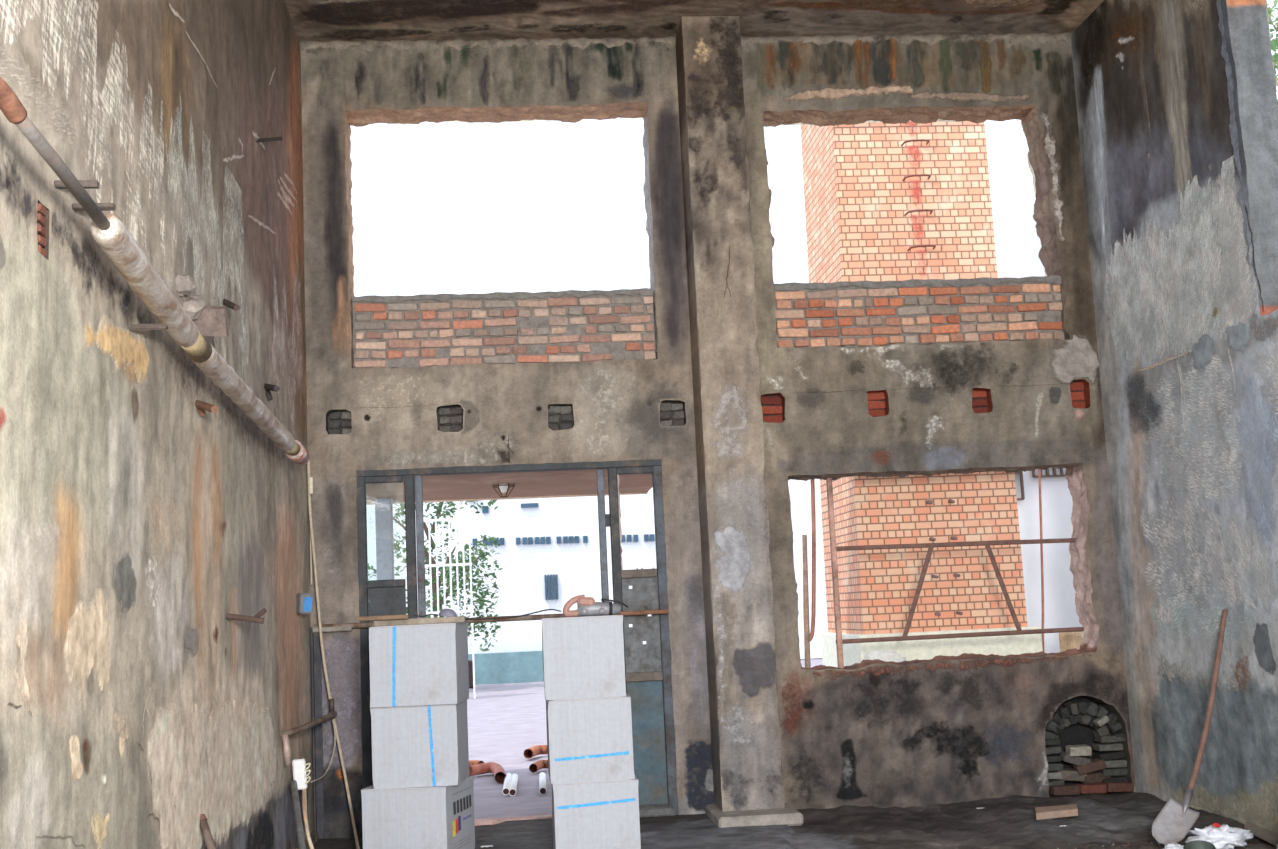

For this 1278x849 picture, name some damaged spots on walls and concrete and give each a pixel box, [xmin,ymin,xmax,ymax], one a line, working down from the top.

leakage [694,41,708,61]
leakage [872,39,924,87]
leakage [940,39,976,91]
peeling [714,527,750,591]
peeling [65,590,111,695]
peeling [71,736,83,779]
peeling [115,687,276,849]
leakage [842,758,852,778]